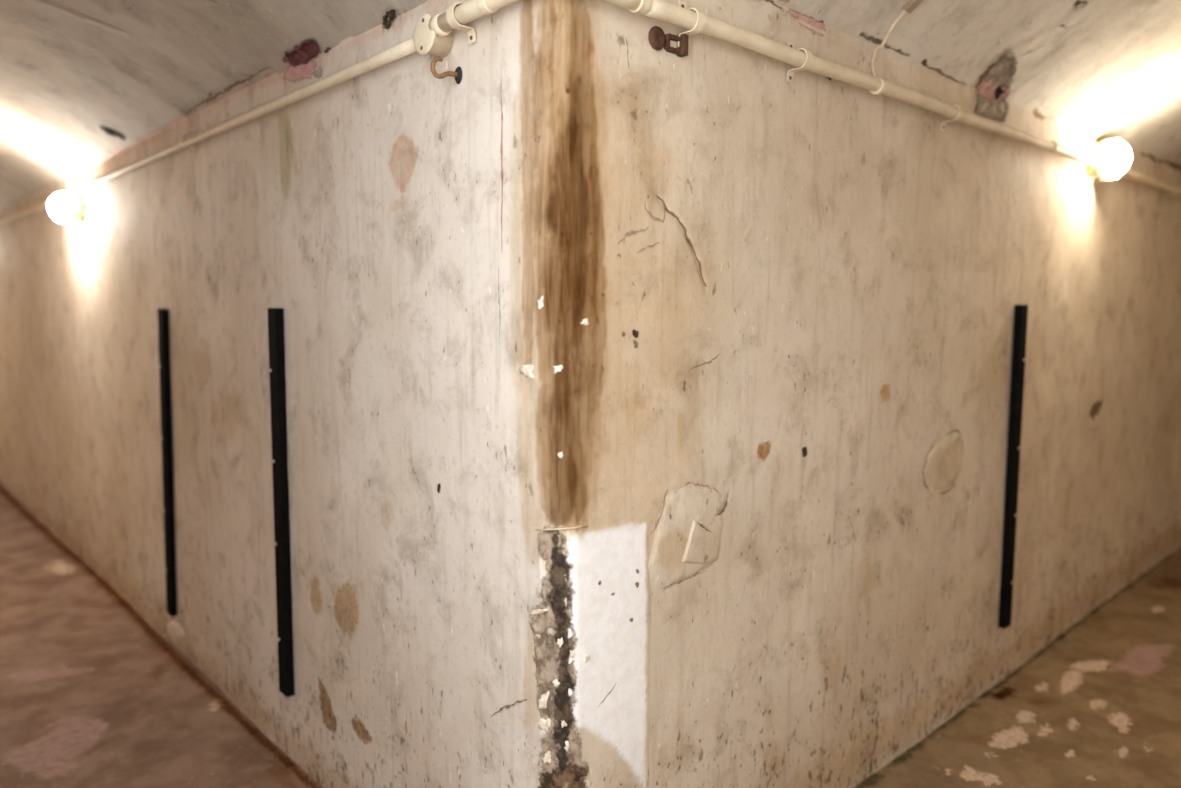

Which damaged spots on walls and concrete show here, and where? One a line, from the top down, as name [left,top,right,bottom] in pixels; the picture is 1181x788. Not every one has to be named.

flaking render [282,40,331,82]
flaking render [975,51,1018,123]
crack [617,196,707,287]
flaking render [528,528,590,788]